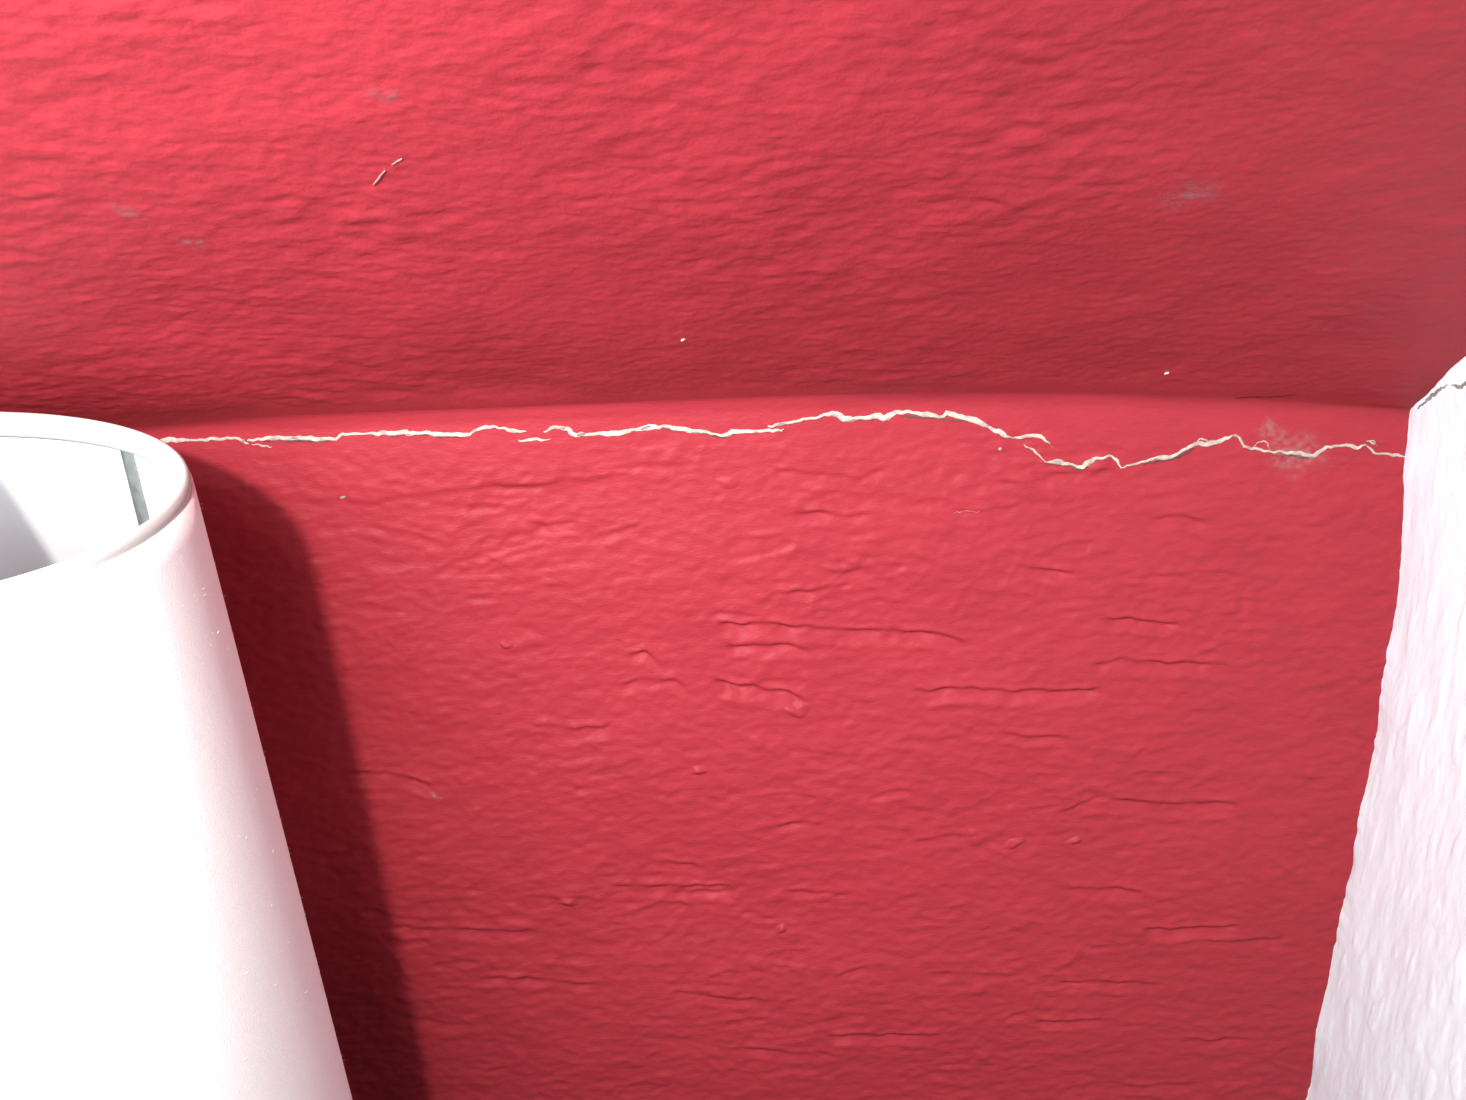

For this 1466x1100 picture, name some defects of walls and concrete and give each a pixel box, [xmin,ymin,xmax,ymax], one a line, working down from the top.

crack [1236,392,1295,400]
crack [160,410,1405,470]